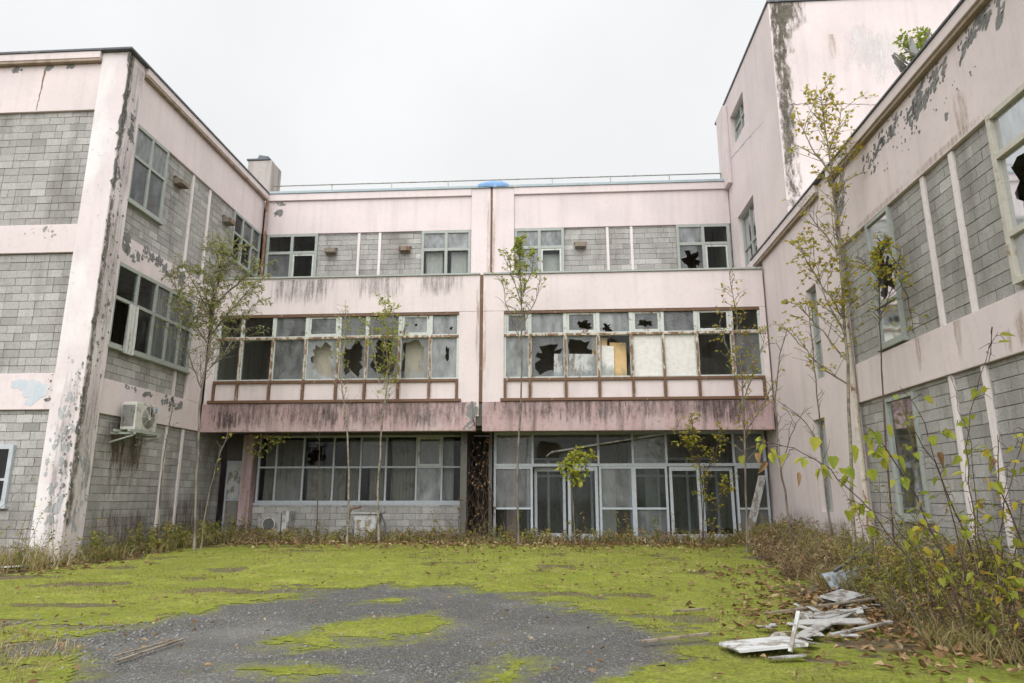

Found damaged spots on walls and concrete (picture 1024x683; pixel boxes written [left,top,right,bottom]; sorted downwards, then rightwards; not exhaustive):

water stain [771,2,801,206]
peeling [862,0,1006,175]
peeling [11,51,189,542]
water stain [105,423,143,471]